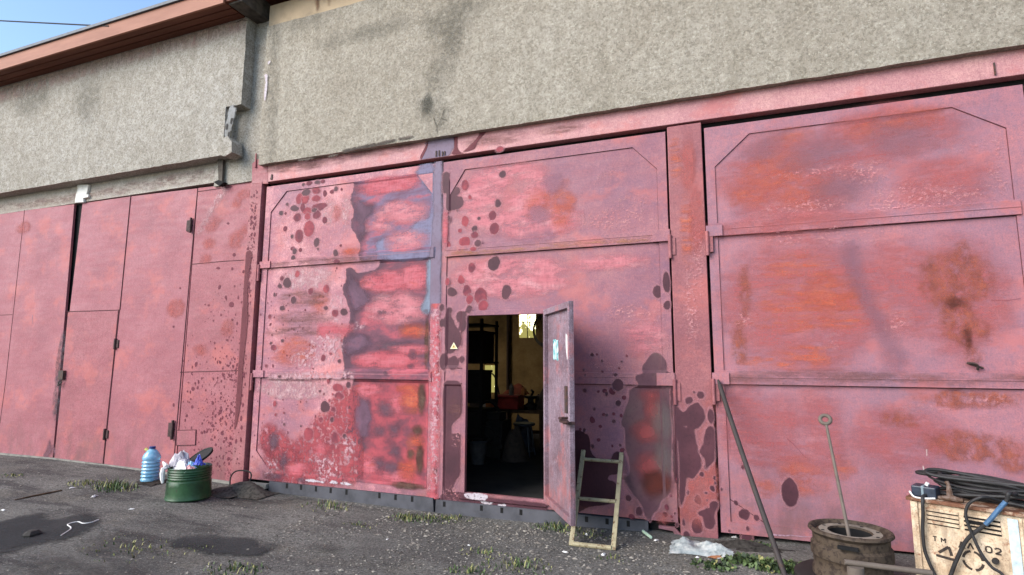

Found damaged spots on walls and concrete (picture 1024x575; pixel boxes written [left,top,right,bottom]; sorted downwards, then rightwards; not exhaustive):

rust [924,246,988,353]
peeling [305,438,356,485]